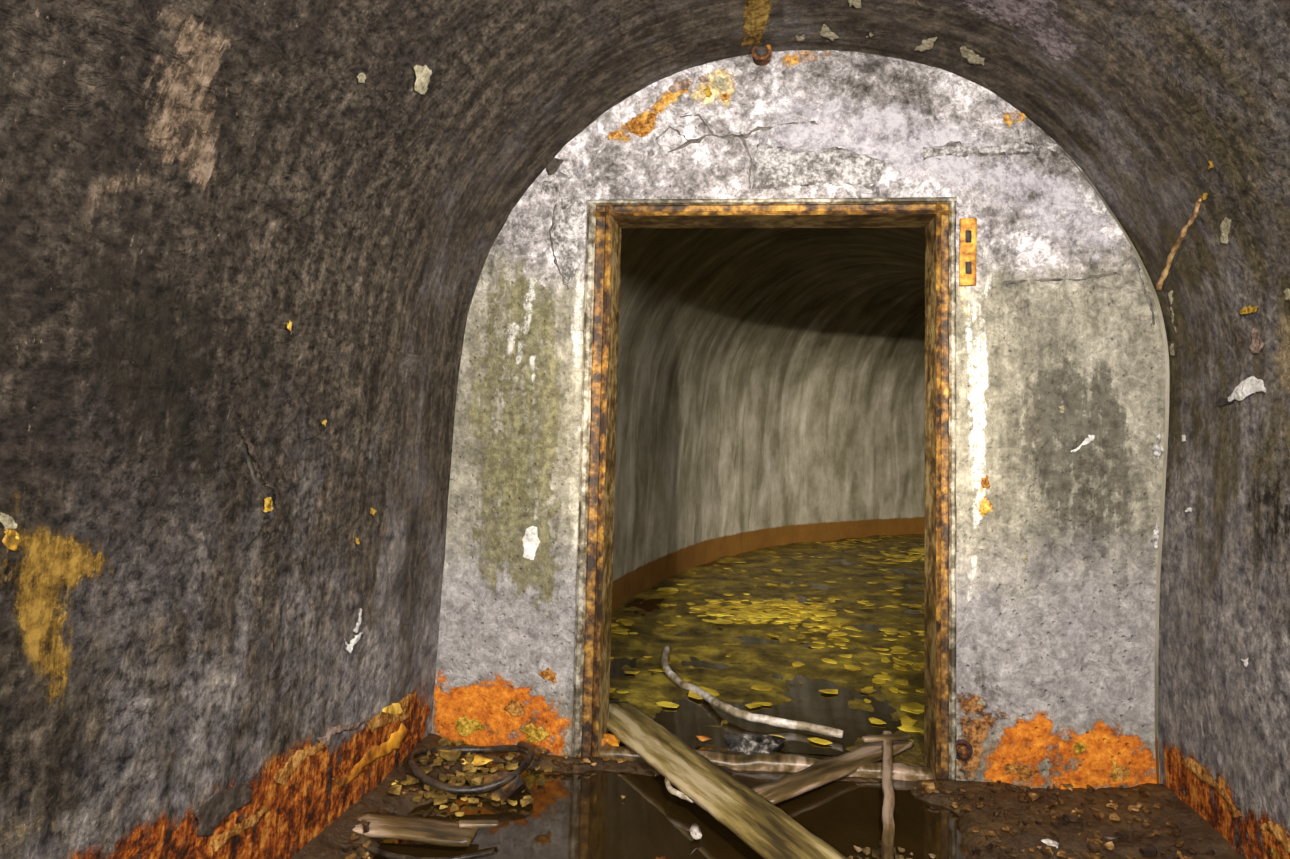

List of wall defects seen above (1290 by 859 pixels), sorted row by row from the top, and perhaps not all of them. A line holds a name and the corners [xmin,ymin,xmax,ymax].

rust [741,0,771,45]
water stain [469,267,584,614]
rust [956,693,1009,781]